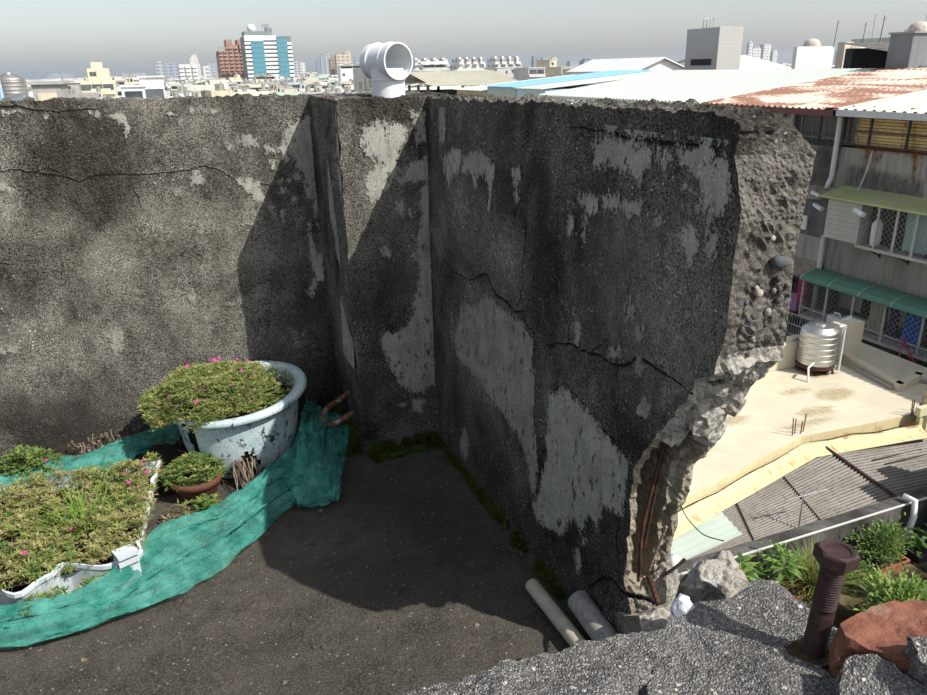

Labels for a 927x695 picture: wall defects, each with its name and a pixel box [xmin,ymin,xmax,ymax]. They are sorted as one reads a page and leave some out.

crack [0,164,288,208]
peeling [223,116,324,299]
peeling [326,110,343,268]
peeling [340,299,355,370]
peeling [357,107,435,415]
peeling [438,107,495,212]
crack [443,222,694,395]
peeling [623,294,648,379]
peeling [566,125,735,272]
spalling [739,255,792,357]
peeling [454,290,632,575]
spalling [636,378,747,614]